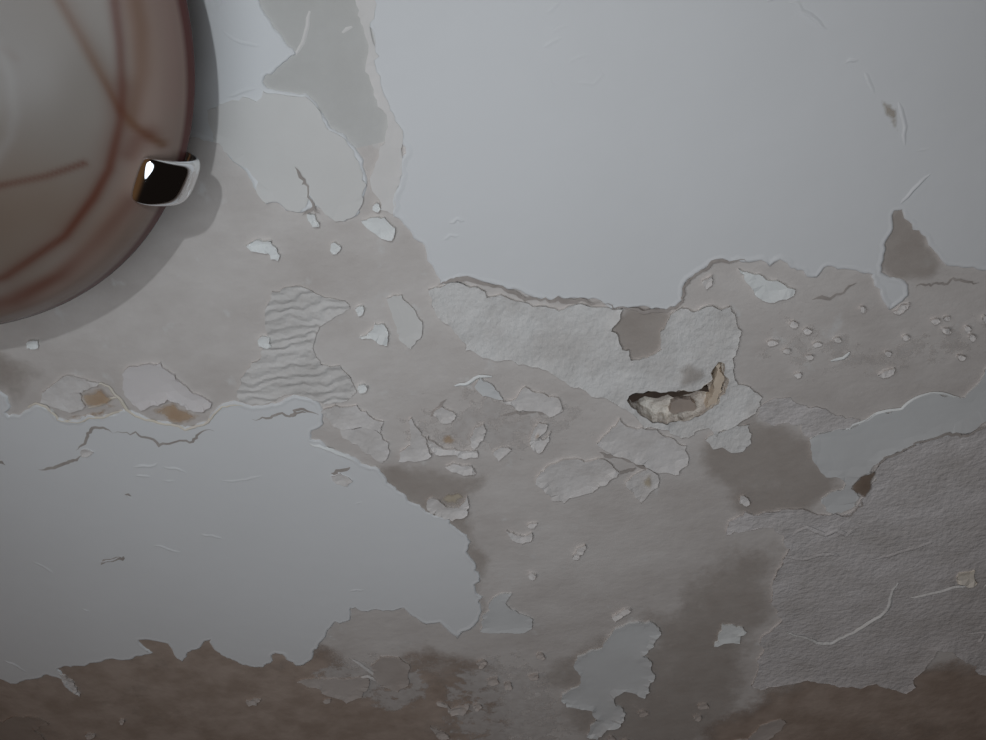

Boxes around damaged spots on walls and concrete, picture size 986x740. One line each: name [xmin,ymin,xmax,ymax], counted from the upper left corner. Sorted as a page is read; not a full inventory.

peeling [253,0,388,150]
peeling [561,206,986,311]
peeling [40,375,99,413]
peeling [122,362,212,412]
peeling [503,386,563,417]
flaking render [627,362,729,425]
crack [42,426,213,470]
peeling [597,418,689,475]
peeling [536,458,619,503]
peeling [0,453,483,697]
water stain [0,639,504,740]
water stain [710,663,986,740]